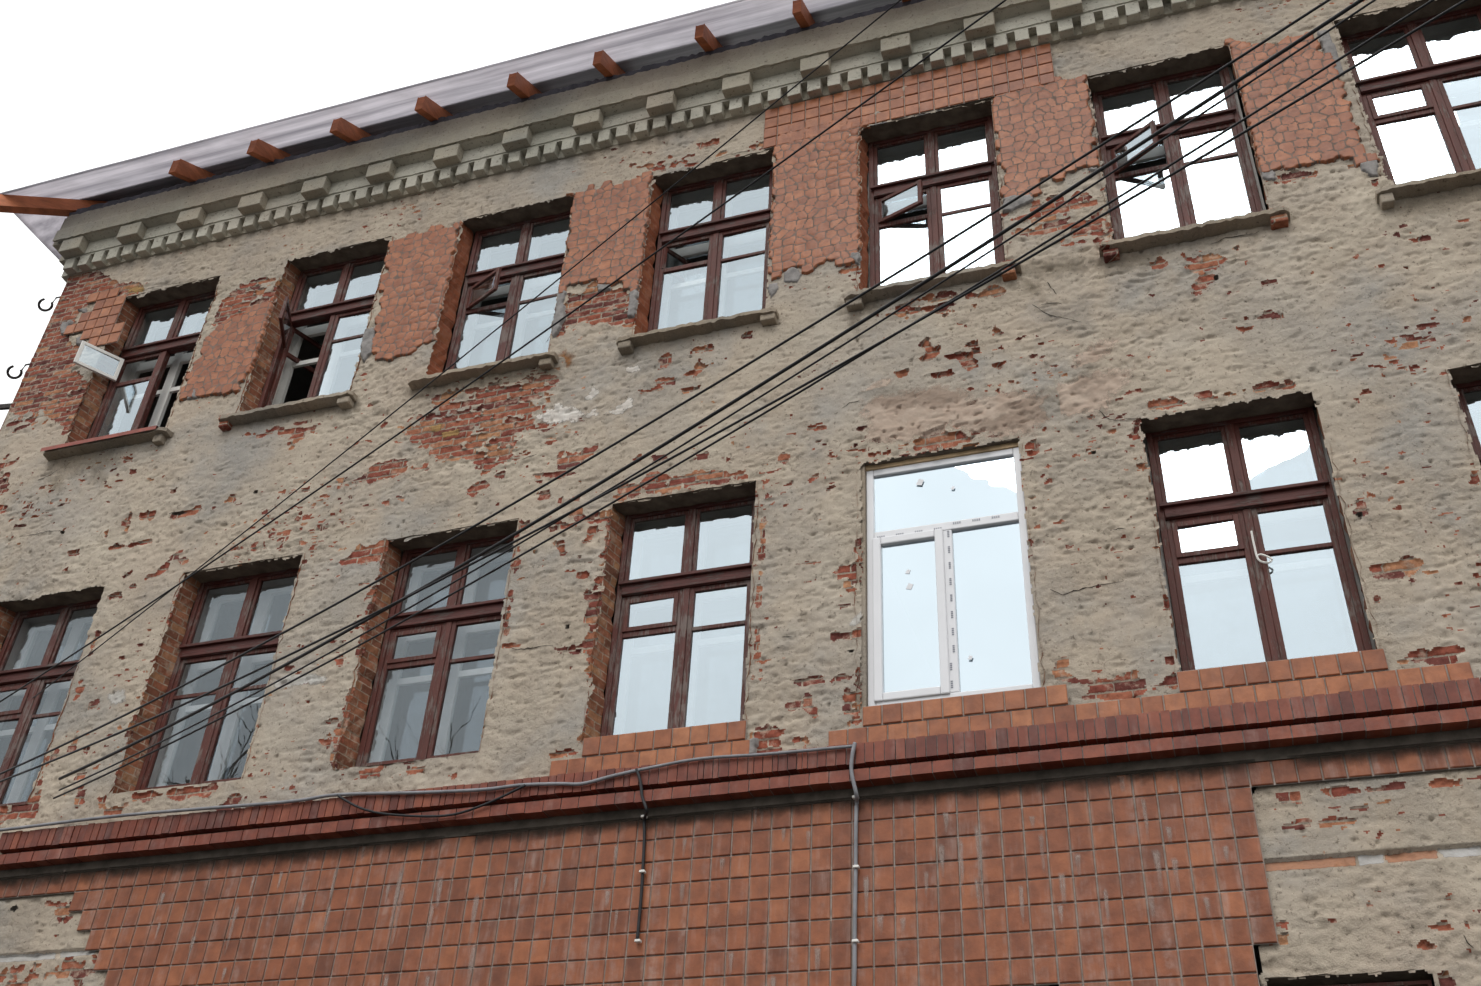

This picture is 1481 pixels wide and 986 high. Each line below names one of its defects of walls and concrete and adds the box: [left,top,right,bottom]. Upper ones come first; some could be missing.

spalling [1266,169,1318,184]
spalling [1001,171,1114,246]
spalling [1382,207,1449,250]
spalling [1330,287,1478,403]
spalling [1468,463,1480,486]
spalling [0,270,1296,825]
spalling [1428,775,1481,788]
spalling [0,900,97,986]
spalling [1269,920,1289,946]
spalling [1417,909,1481,951]
spalling [1437,970,1456,986]